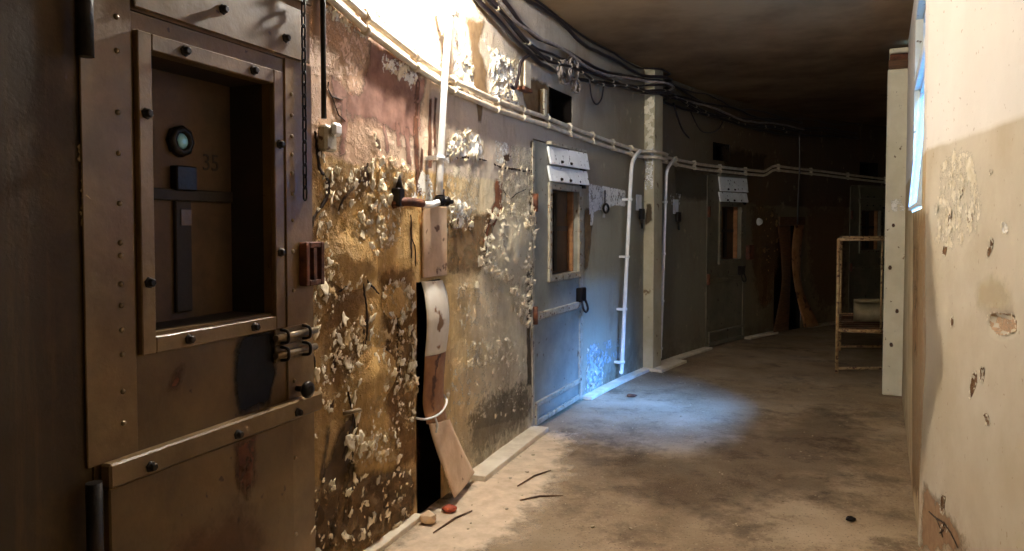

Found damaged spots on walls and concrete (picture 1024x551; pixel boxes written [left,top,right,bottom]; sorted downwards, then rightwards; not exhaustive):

peeling [382,52,418,91]
peeling [446,125,484,163]
peeling [936,166,979,257]
peeling [311,132,419,551]
peeling [441,153,540,425]
damp [471,267,532,455]
flaking render [968,366,985,399]
flaking render [987,312,1017,337]